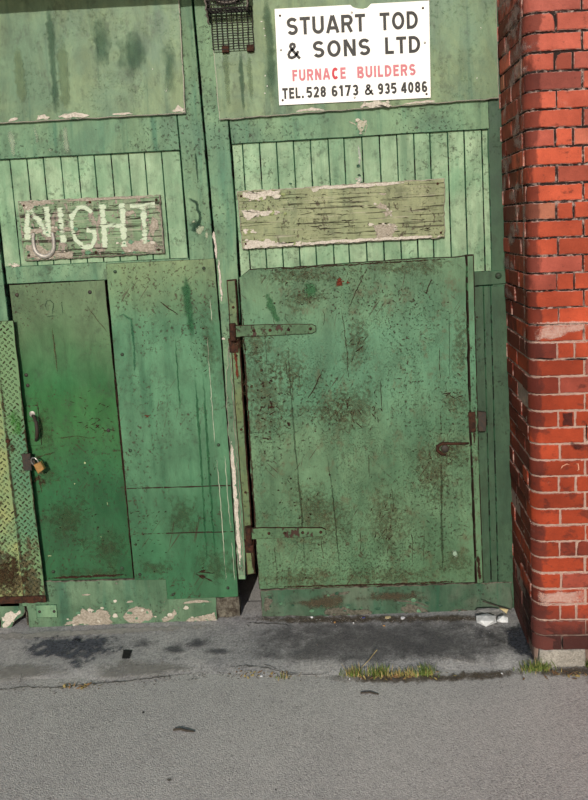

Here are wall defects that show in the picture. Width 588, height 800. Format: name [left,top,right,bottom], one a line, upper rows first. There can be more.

peeling [360,100,391,108]
peeling [349,118,368,134]
peeling [241,146,441,249]
peeling [116,216,158,254]
rust [265,259,440,270]
rust [234,337,288,528]
rust [0,380,30,596]
rust [275,577,454,588]
peeling [2,610,21,628]
peeling [65,600,217,626]